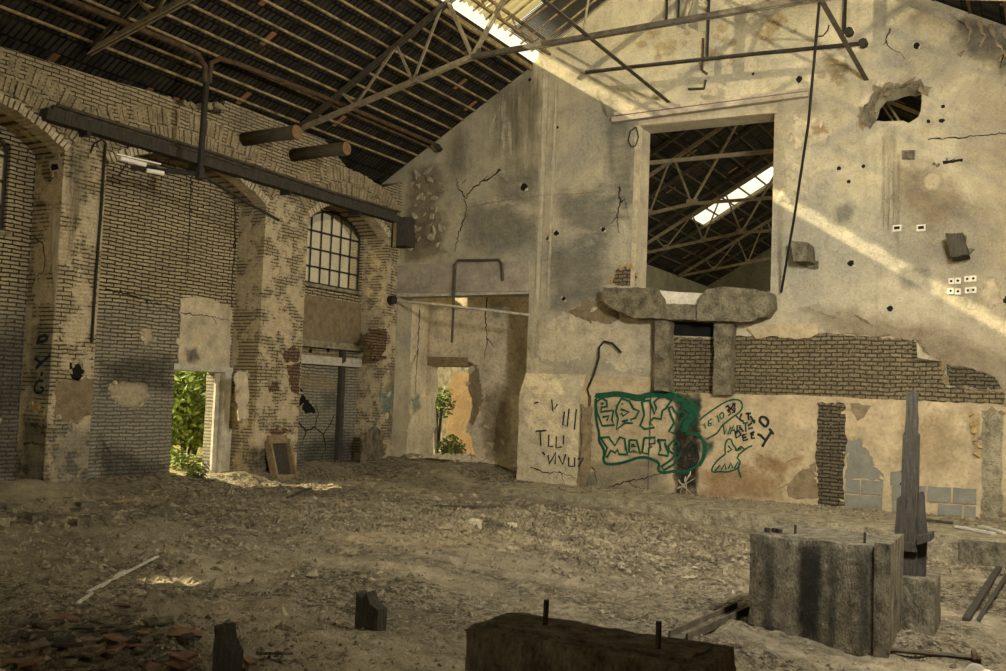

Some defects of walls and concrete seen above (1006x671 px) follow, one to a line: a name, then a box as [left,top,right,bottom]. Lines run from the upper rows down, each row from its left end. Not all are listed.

spalling [857,76,932,131]
flaking render [407,166,447,251]
crack [455,169,625,249]
flaking render [465,364,510,448]
flaking render [673,335,714,394]
flaking render [734,333,1006,521]